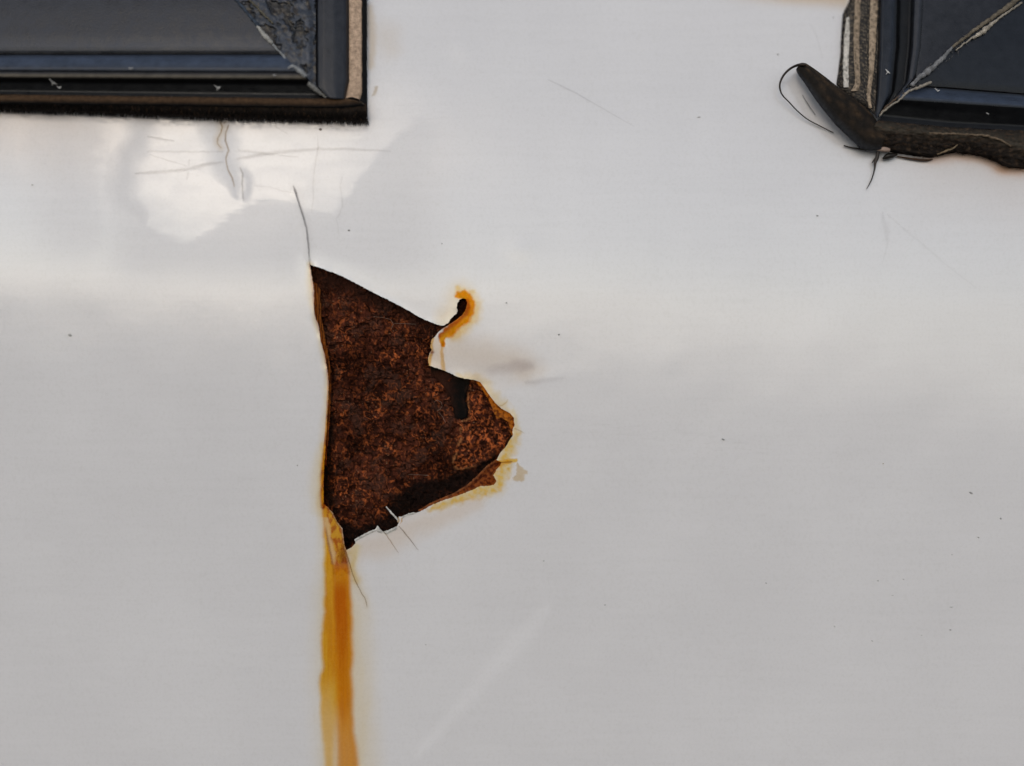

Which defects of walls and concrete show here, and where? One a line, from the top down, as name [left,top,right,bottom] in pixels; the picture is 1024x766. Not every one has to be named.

peeling [310,265,515,550]